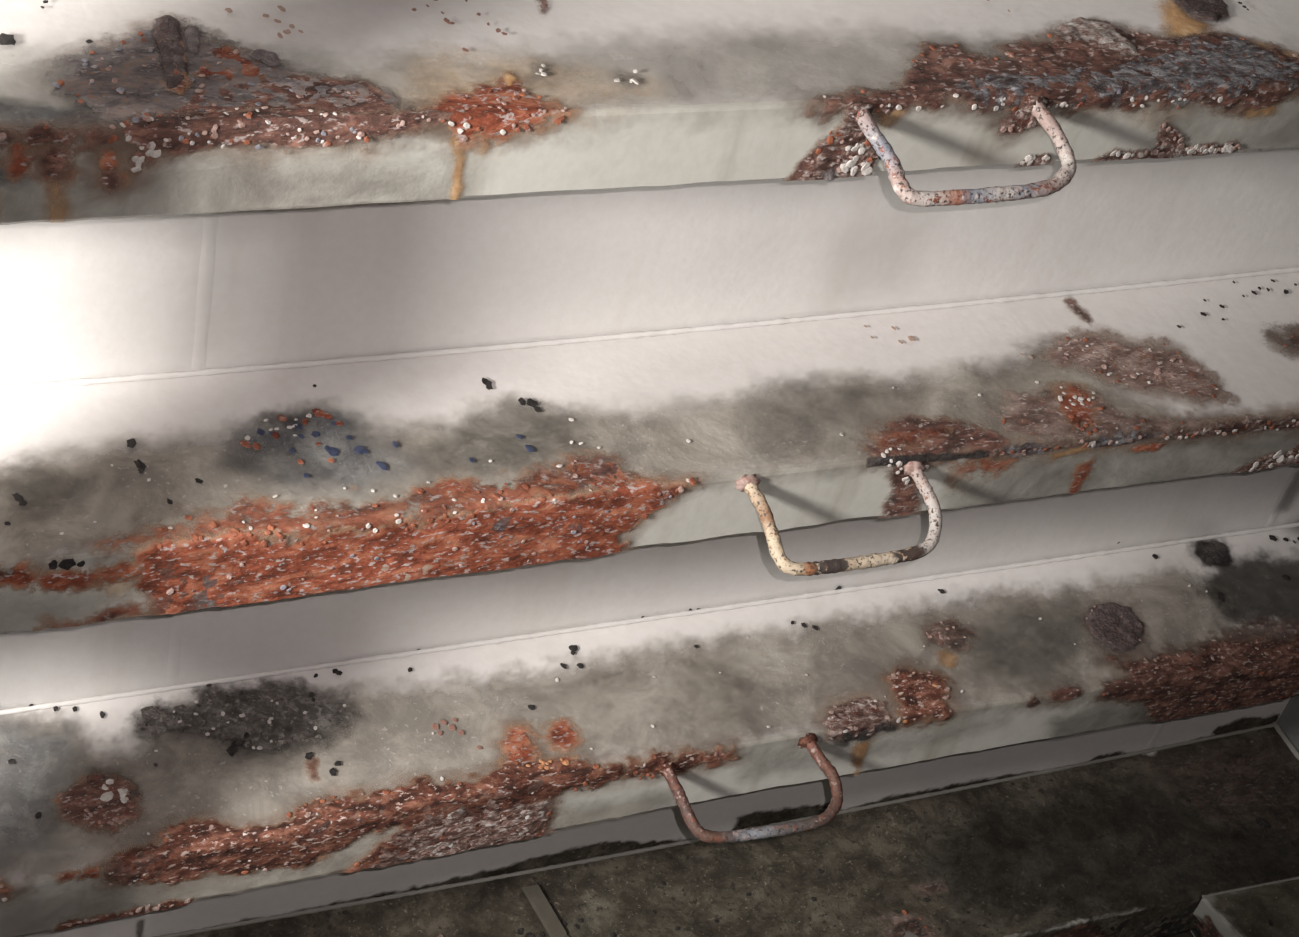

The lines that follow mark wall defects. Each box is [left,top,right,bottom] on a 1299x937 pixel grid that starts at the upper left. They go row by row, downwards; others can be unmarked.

leakage [0,67,121,135]
leakage [0,159,464,225]
corrosion [0,5,641,223]
leakage [530,40,921,103]
corrosion [804,17,1299,159]
corrosion [0,454,696,631]
leakage [0,350,1299,571]
corrosion [861,298,1299,518]
corrosion [53,704,739,932]
leakage [0,540,1299,881]
leakage [181,715,1299,937]
corrosion [1026,617,1299,722]